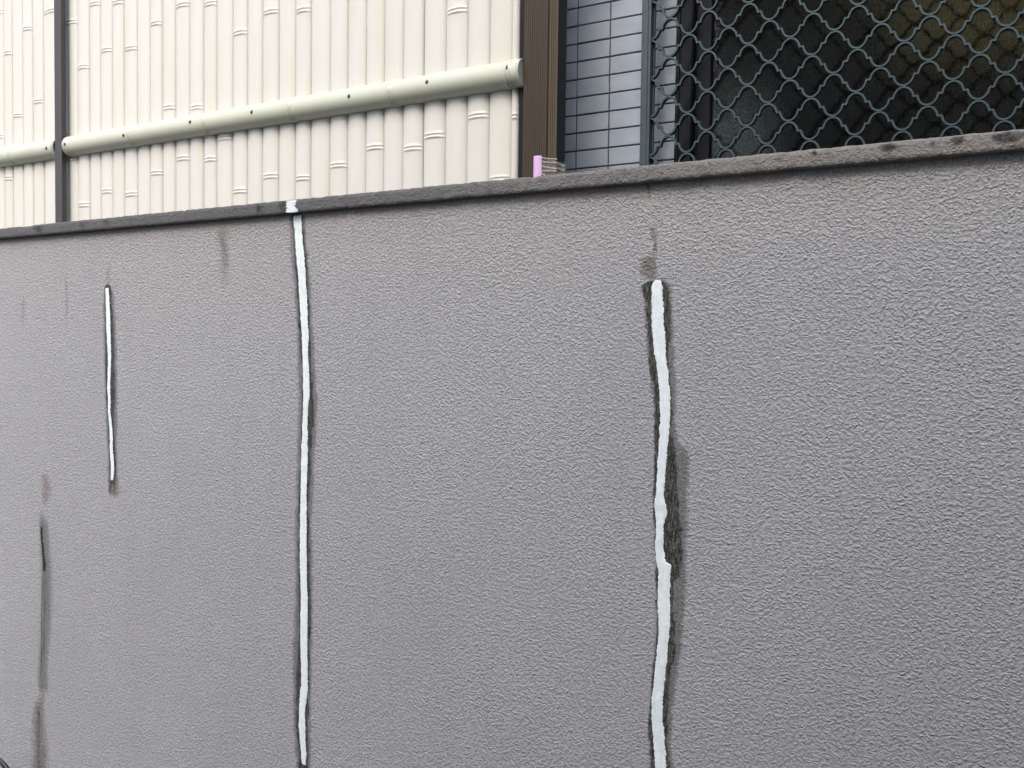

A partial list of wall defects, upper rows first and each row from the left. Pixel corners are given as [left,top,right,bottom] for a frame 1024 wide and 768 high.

crack [39,521,49,689]
crack [103,285,117,494]
crack [290,214,317,768]
crack [642,280,688,768]